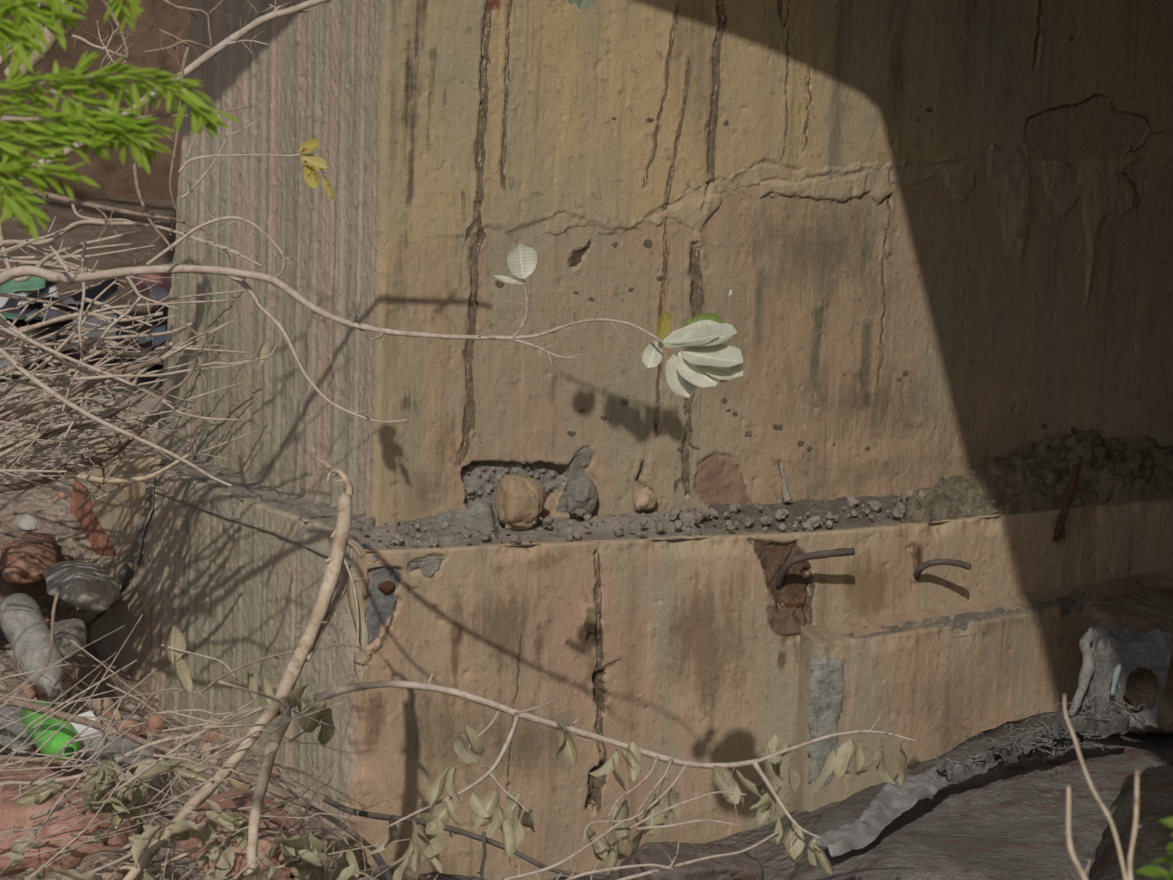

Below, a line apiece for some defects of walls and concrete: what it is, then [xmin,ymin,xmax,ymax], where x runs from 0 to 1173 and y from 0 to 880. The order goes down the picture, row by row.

crack [459,0,513,465]
crack [643,0,727,495]
spalling [160,452,191,474]
spalling [70,468,335,657]
spalling [343,447,593,646]
flaking render [694,455,754,506]
crack [586,553,622,813]